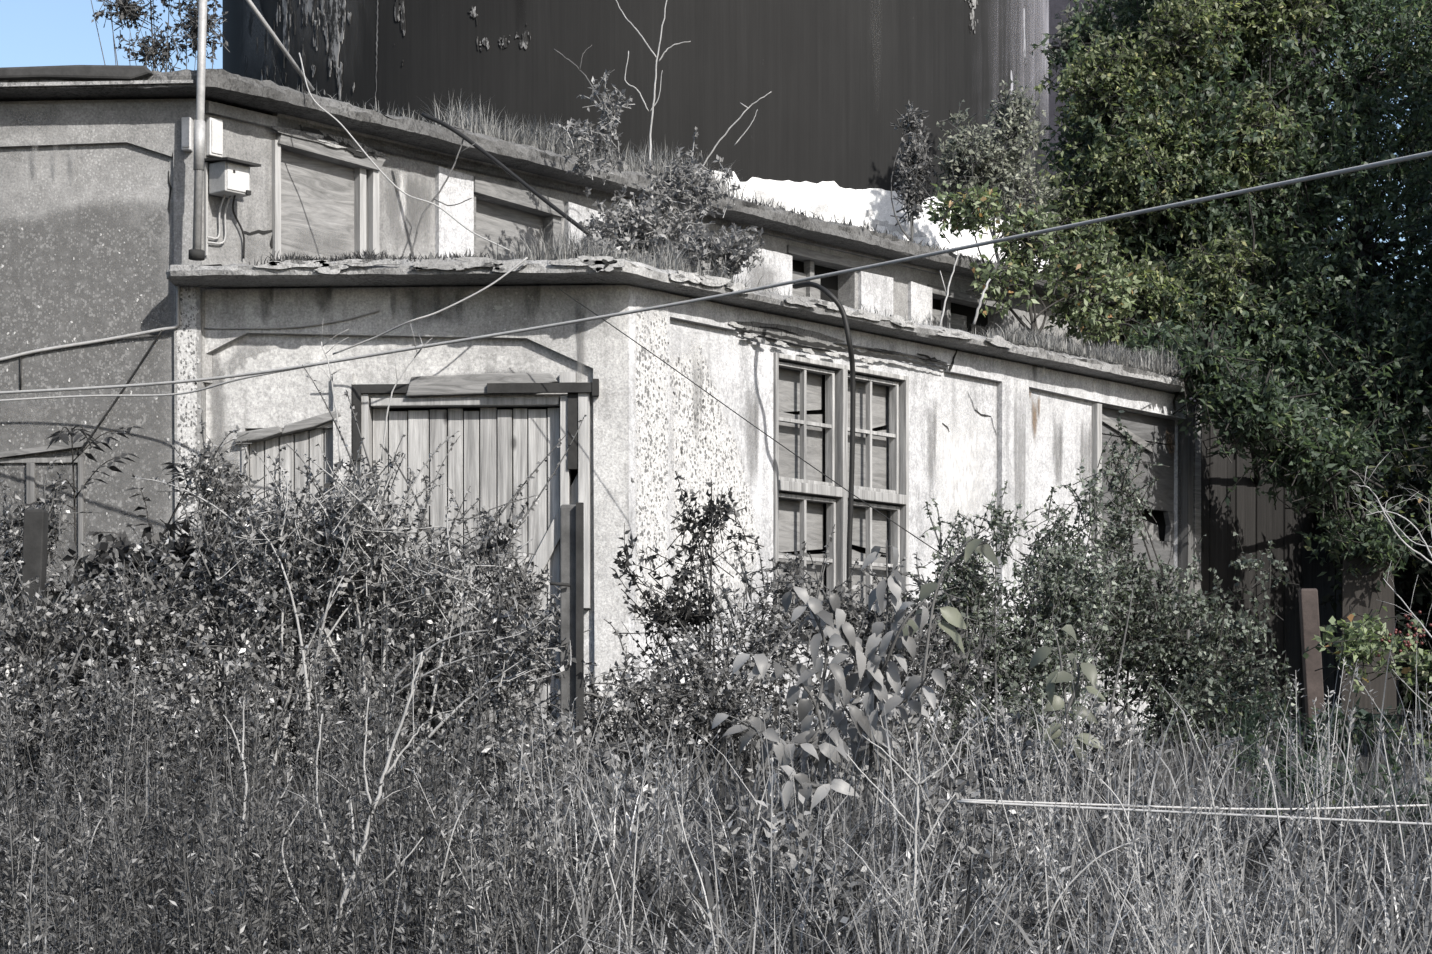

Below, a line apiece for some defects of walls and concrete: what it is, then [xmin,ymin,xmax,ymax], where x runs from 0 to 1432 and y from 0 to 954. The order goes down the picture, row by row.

peeling [243,0,355,101]
peeling [394,0,406,45]
peeling [468,6,531,52]
peeling [965,0,978,34]